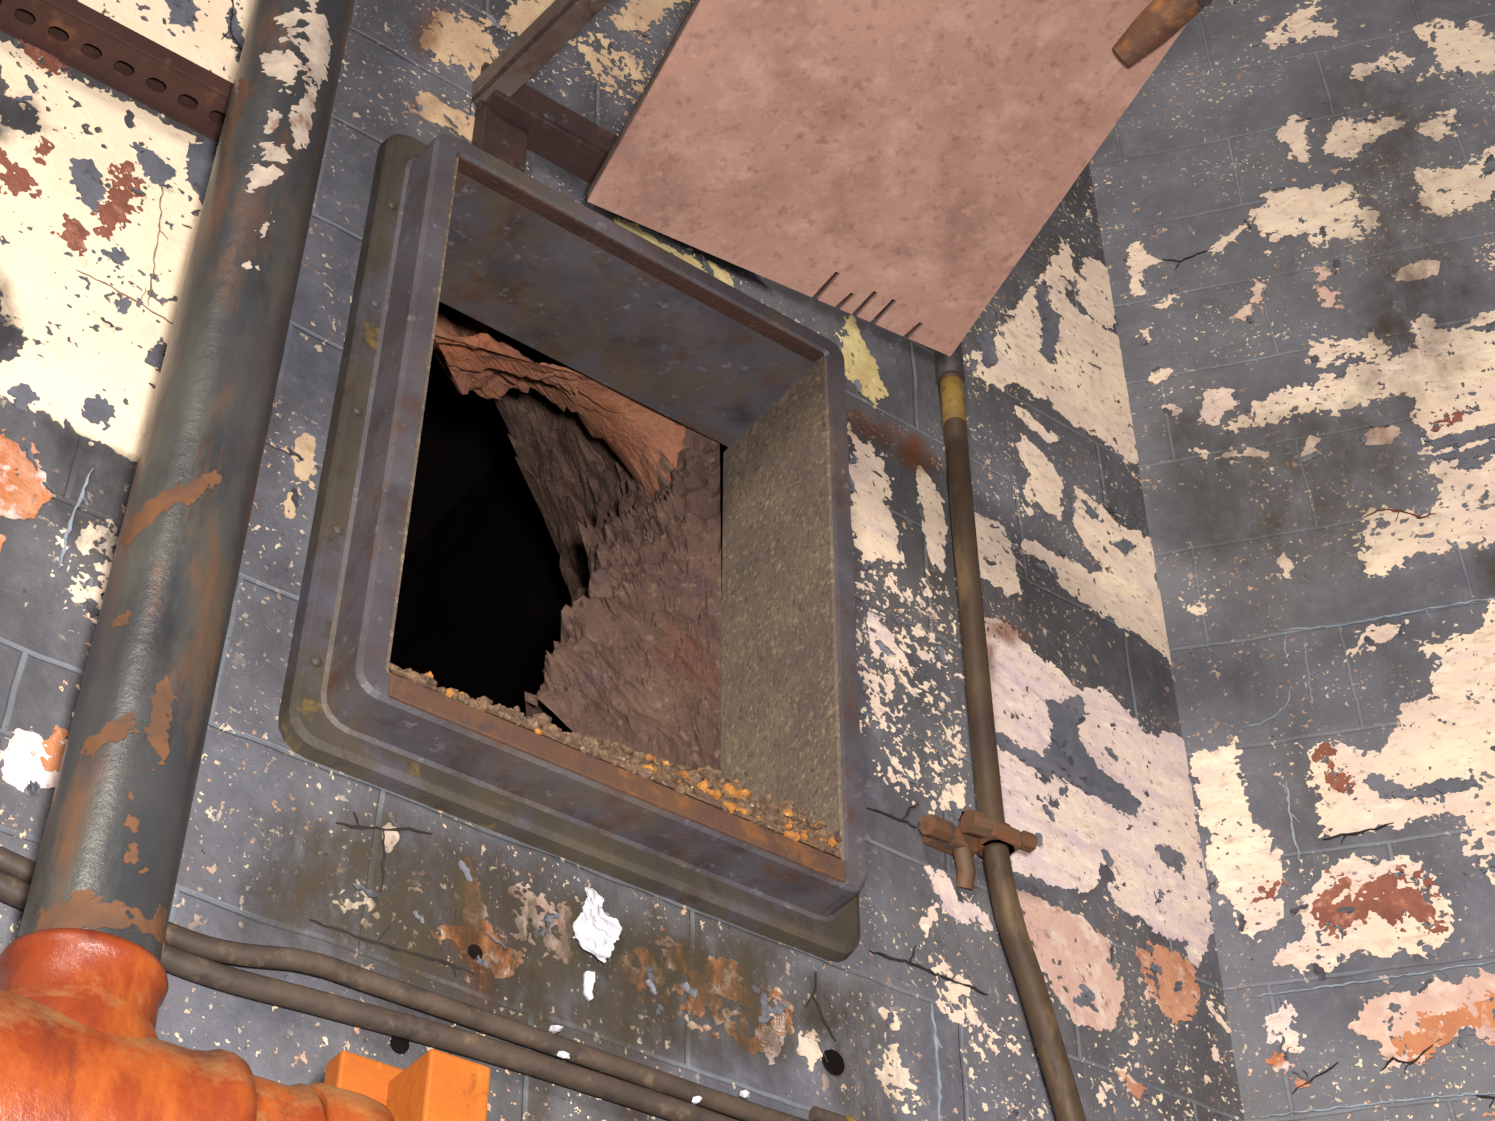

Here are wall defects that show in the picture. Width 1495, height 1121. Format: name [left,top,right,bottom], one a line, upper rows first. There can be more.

peeling [0,39,217,463]
peeling [1207,178,1381,309]
peeling [1275,108,1463,163]
peeling [1387,254,1441,282]
peeling [1412,144,1495,218]
peeling [834,316,889,409]
spalling [0,429,55,551]
peeling [963,238,1183,665]
peeling [1158,310,1495,579]
peeling [847,422,976,819]
peeling [0,725,69,796]
peeling [911,861,1051,1121]